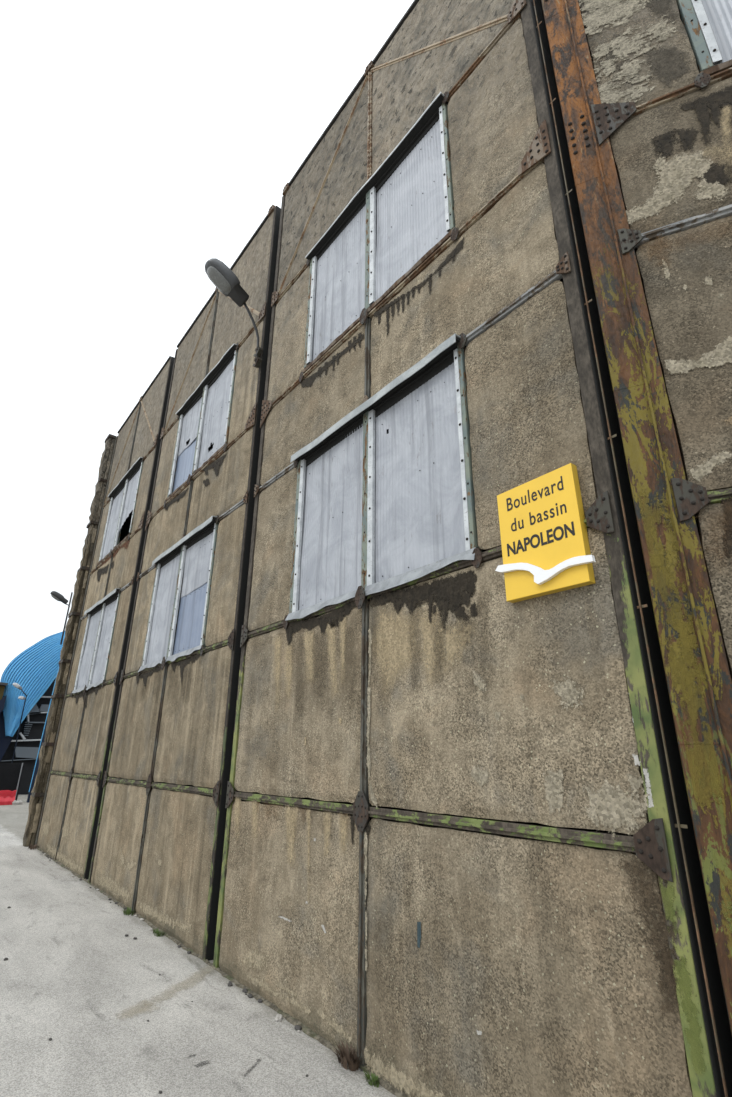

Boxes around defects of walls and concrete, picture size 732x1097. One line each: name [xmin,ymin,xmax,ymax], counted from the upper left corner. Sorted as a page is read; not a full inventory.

spalling [578,0,678,104]
spalling [626,151,728,225]
spalling [664,336,732,374]
damp [275,600,357,691]
damp [370,569,478,685]
rust [619,849,681,1022]